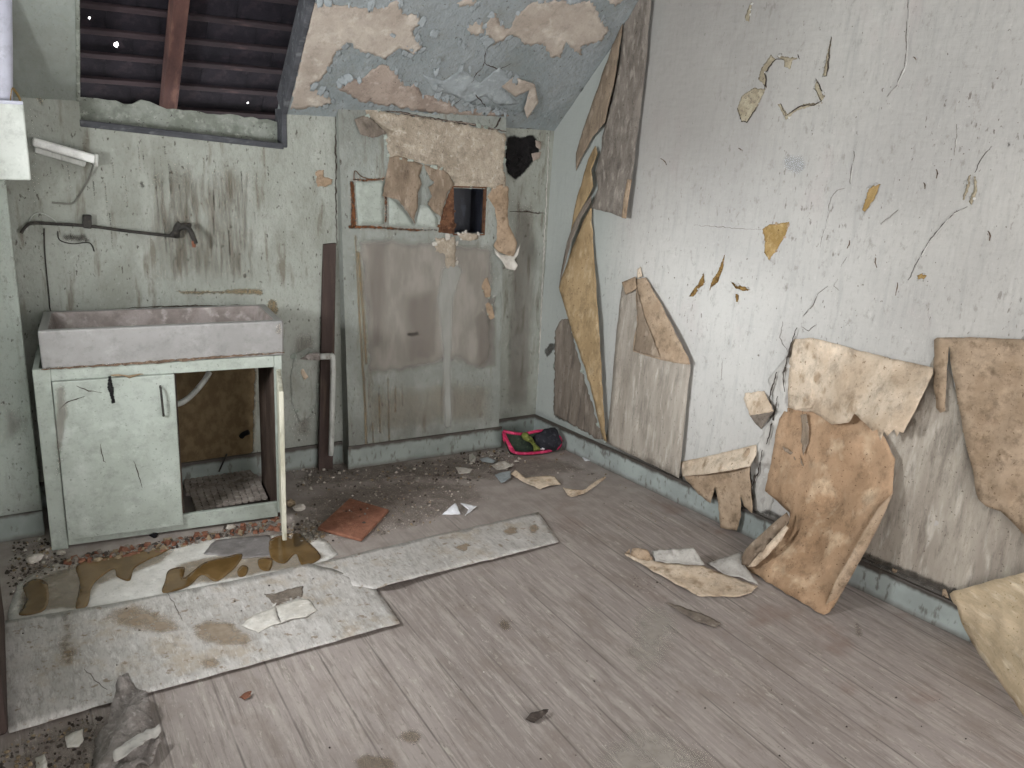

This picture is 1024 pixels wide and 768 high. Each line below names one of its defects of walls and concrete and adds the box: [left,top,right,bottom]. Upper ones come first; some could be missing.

peeling [457,0,627,58]
crack [887,0,909,97]
peeling [290,0,541,270]
rust [348,178,457,234]
crack [386,49,549,400]
peeling [762,222,790,260]
peeling [862,183,880,214]
peeling [553,319,606,443]
peeling [865,358,1024,599]
leakage [204,535,271,559]